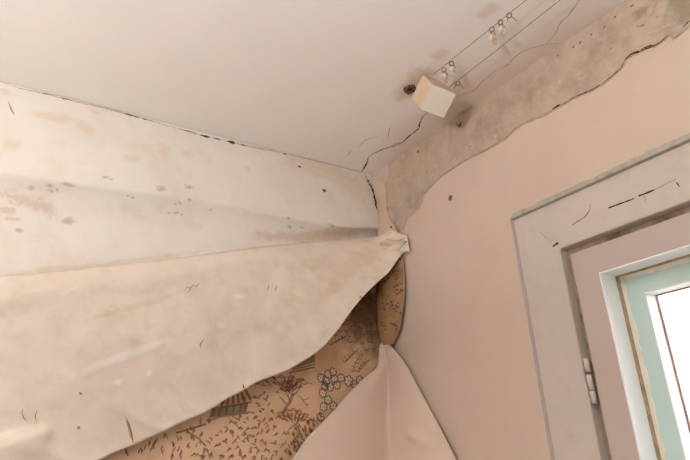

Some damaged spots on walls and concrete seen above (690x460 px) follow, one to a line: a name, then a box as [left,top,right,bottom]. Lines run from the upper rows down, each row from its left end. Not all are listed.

crack [1,82,428,208]
water stain [239,0,624,323]
flaking render [388,0,690,233]